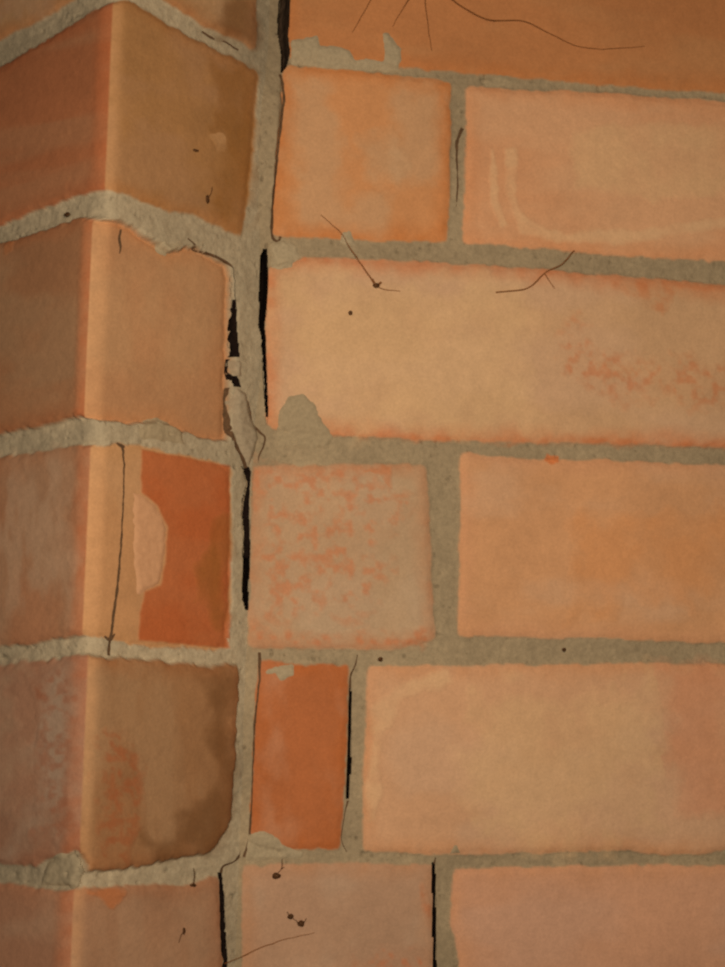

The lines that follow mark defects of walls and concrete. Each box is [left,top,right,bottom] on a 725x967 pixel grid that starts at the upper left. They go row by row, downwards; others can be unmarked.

crack [188,0,290,610]
crack [104,442,125,656]
peeling [133,448,239,649]
crack [217,652,261,967]
crack [341,655,358,852]
crack [430,858,438,967]